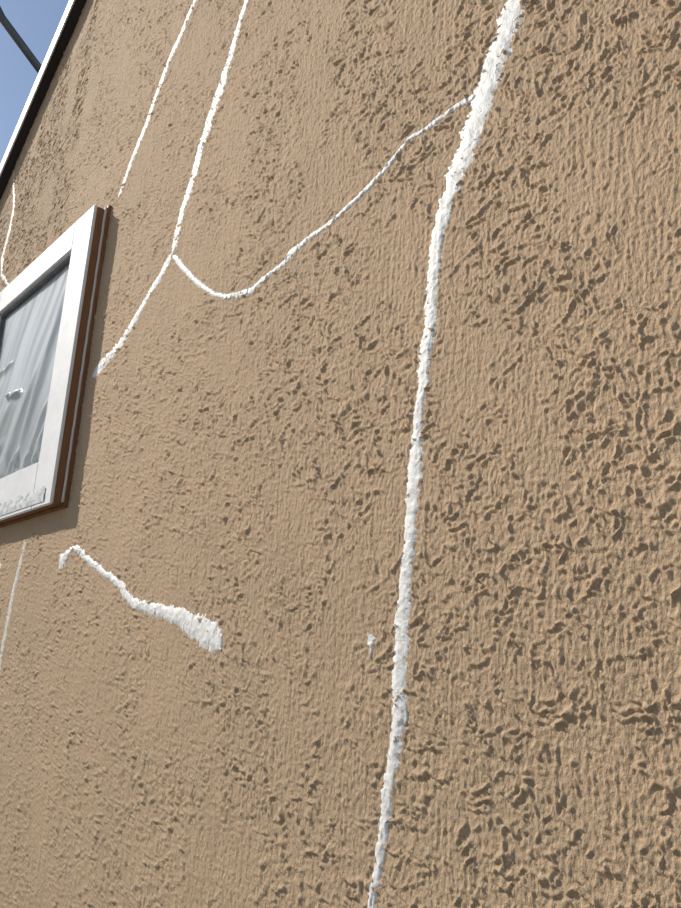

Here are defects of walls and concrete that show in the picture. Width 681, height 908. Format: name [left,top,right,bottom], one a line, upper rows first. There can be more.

crack [0,540,26,673]
crack [92,0,527,908]